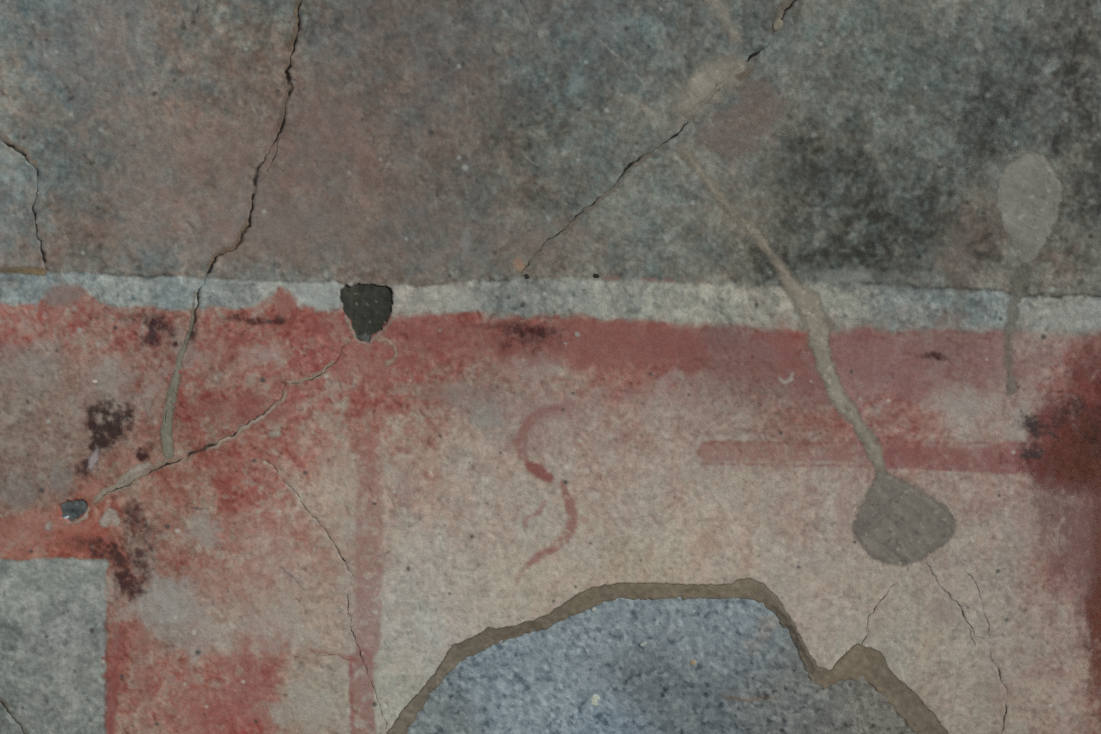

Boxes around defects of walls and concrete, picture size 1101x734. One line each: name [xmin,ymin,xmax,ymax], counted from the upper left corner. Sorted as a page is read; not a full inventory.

crack [4,140,46,263]
crack [188,1,302,340]
crack [528,0,797,266]
crack [94,339,350,503]
spalling [45,499,120,530]
spalling [408,597,917,734]